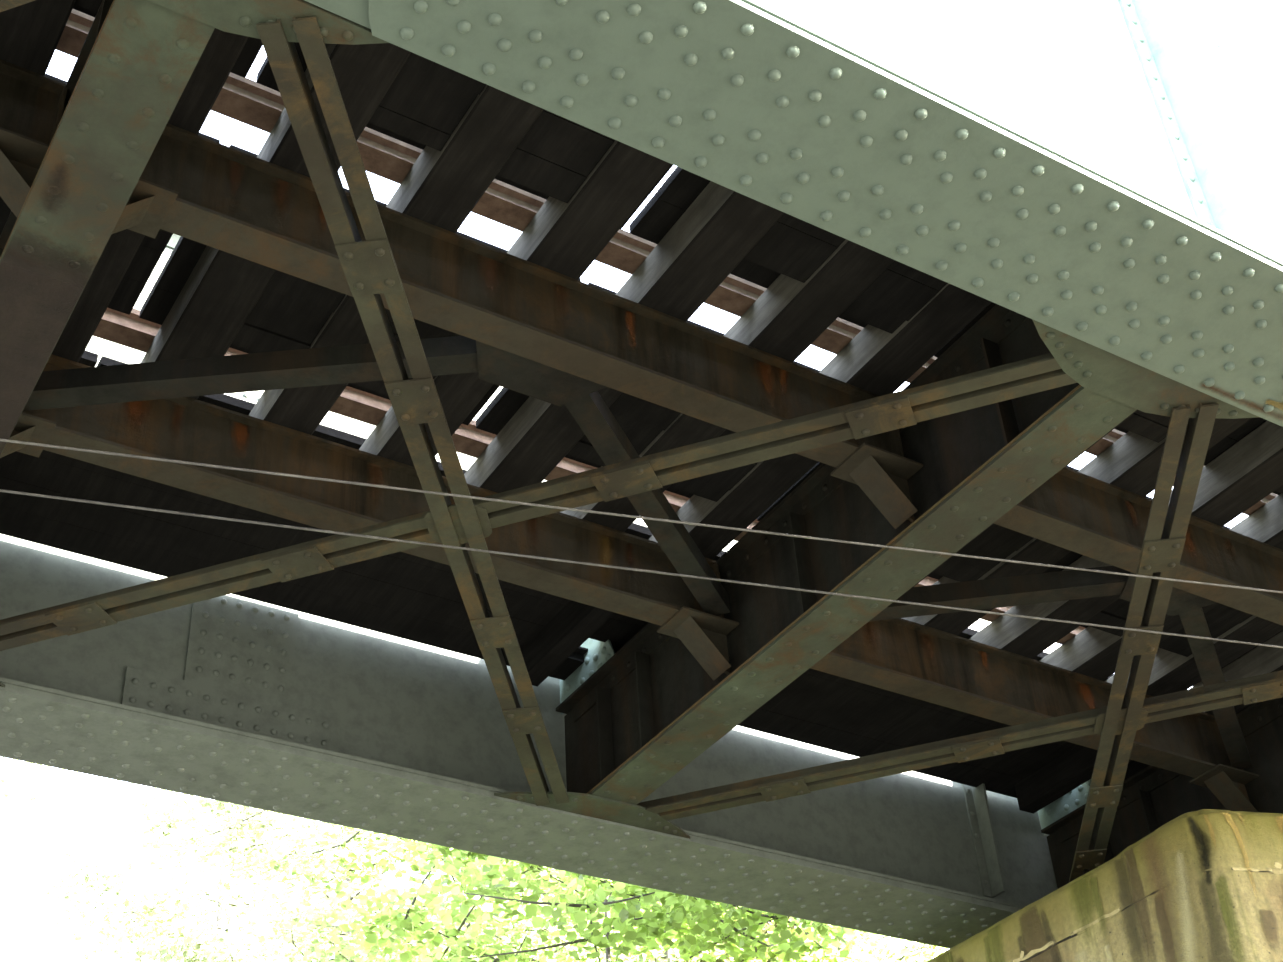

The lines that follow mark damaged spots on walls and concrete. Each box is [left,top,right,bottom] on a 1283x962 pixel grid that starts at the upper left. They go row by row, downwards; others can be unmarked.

damp [1021,908,1059,962]
damp [1125,850,1175,962]